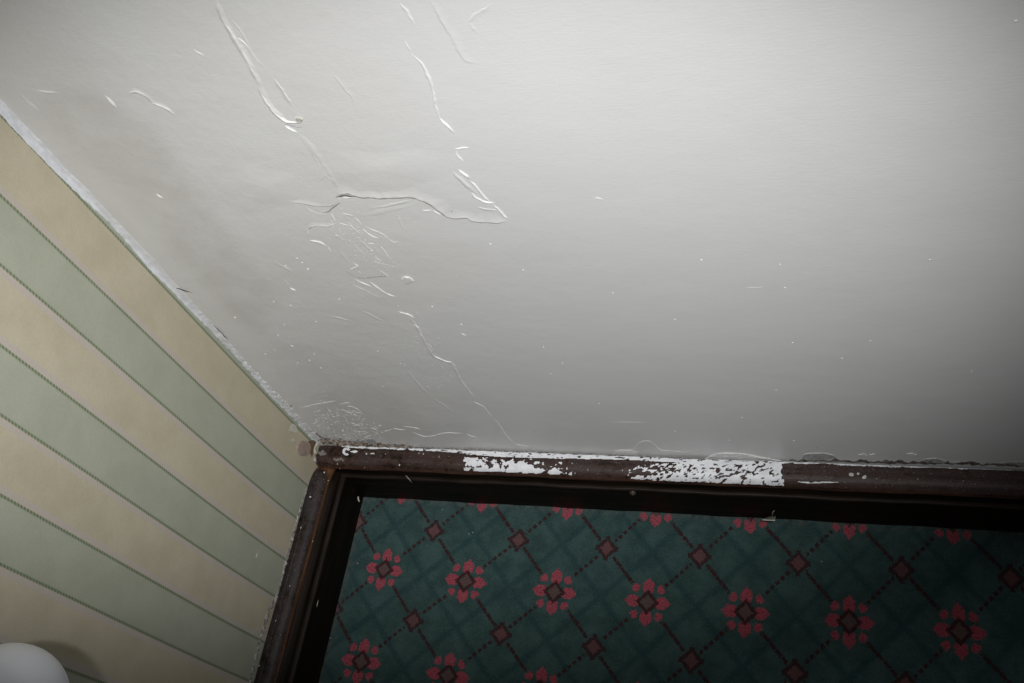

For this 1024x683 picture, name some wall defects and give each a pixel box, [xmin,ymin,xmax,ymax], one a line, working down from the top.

peeling [291,169,508,300]